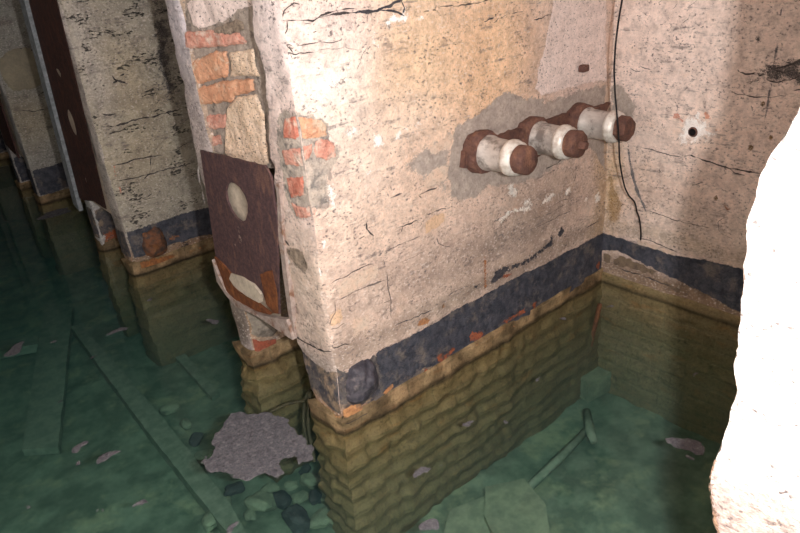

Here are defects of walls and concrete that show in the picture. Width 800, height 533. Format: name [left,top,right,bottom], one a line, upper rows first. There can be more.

crack [282,0,405,69]
crack [731,59,800,98]
crack [103,108,182,127]
flaking render [185,19,359,220]
crack [113,143,193,200]
crack [641,147,761,185]
rust [214,256,278,315]
crack [297,188,456,352]
leakage [490,227,564,283]